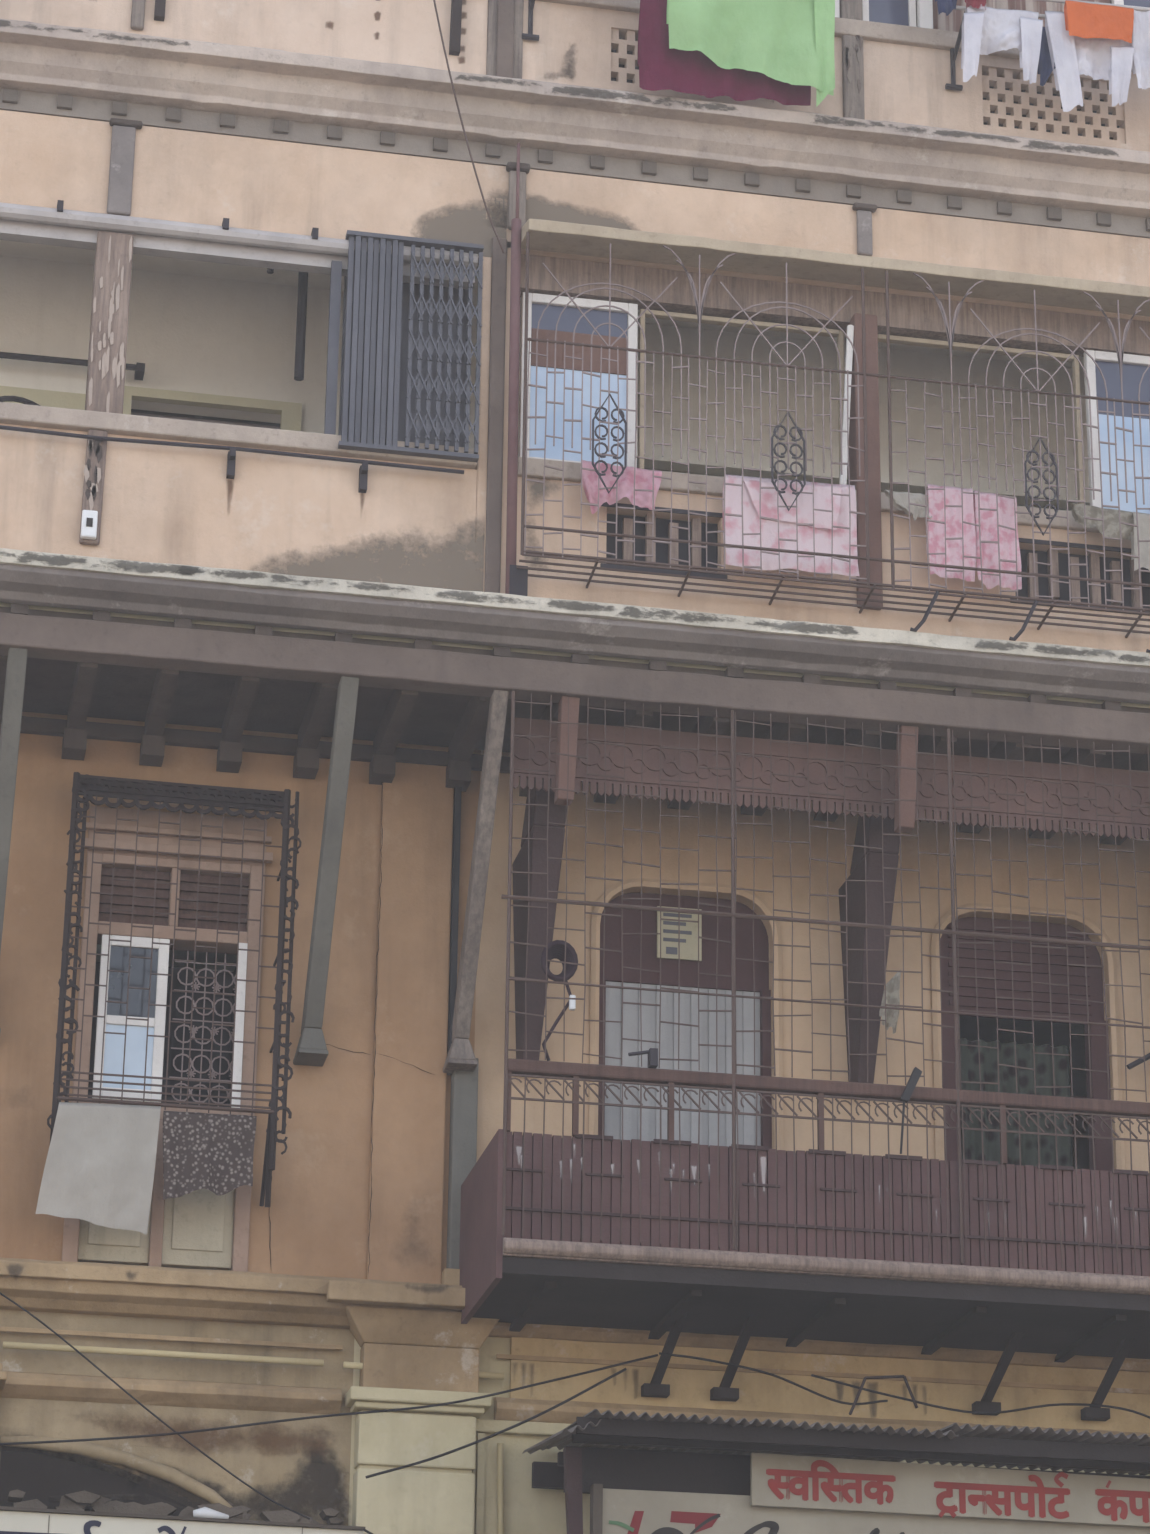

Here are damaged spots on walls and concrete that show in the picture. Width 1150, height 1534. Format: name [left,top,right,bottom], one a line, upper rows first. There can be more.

water stain [419,195,508,257]
water stain [526,197,632,230]
peeling [88,235,132,412]
water stain [2,522,732,622]
water stain [754,621,858,634]
crack [326,784,431,1273]